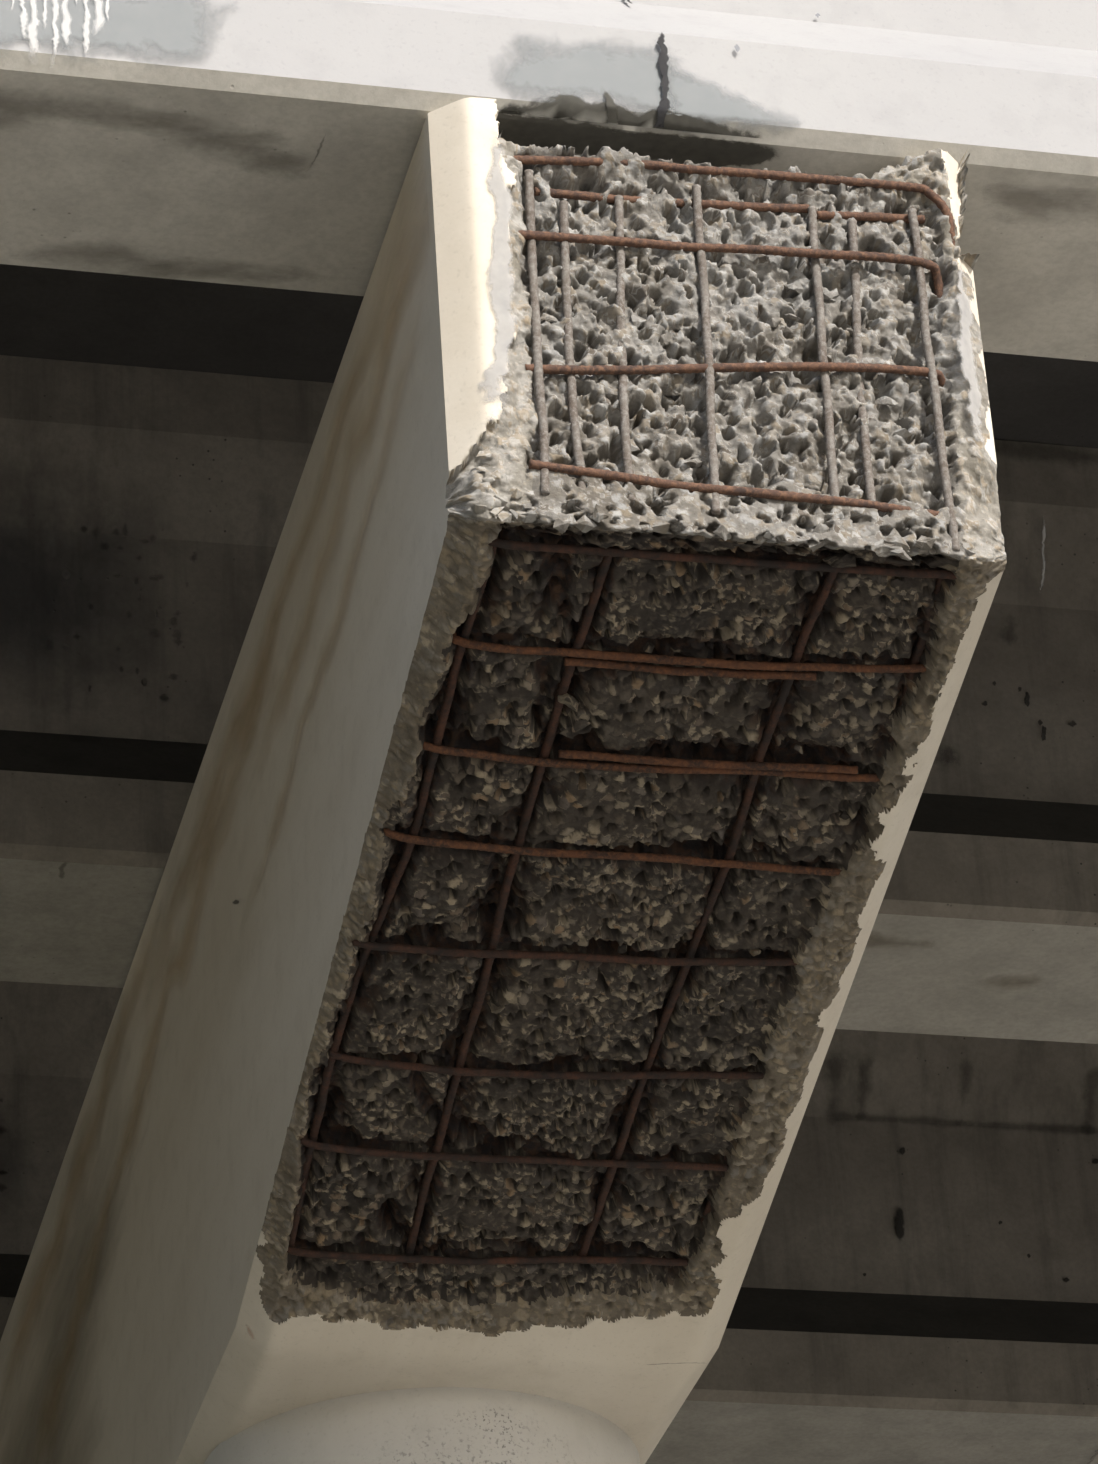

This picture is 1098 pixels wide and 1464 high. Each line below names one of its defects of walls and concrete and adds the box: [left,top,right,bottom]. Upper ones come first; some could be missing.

leakage [0,0,209,57]
crack [655,33,670,127]
spalling [256,39,1007,1337]